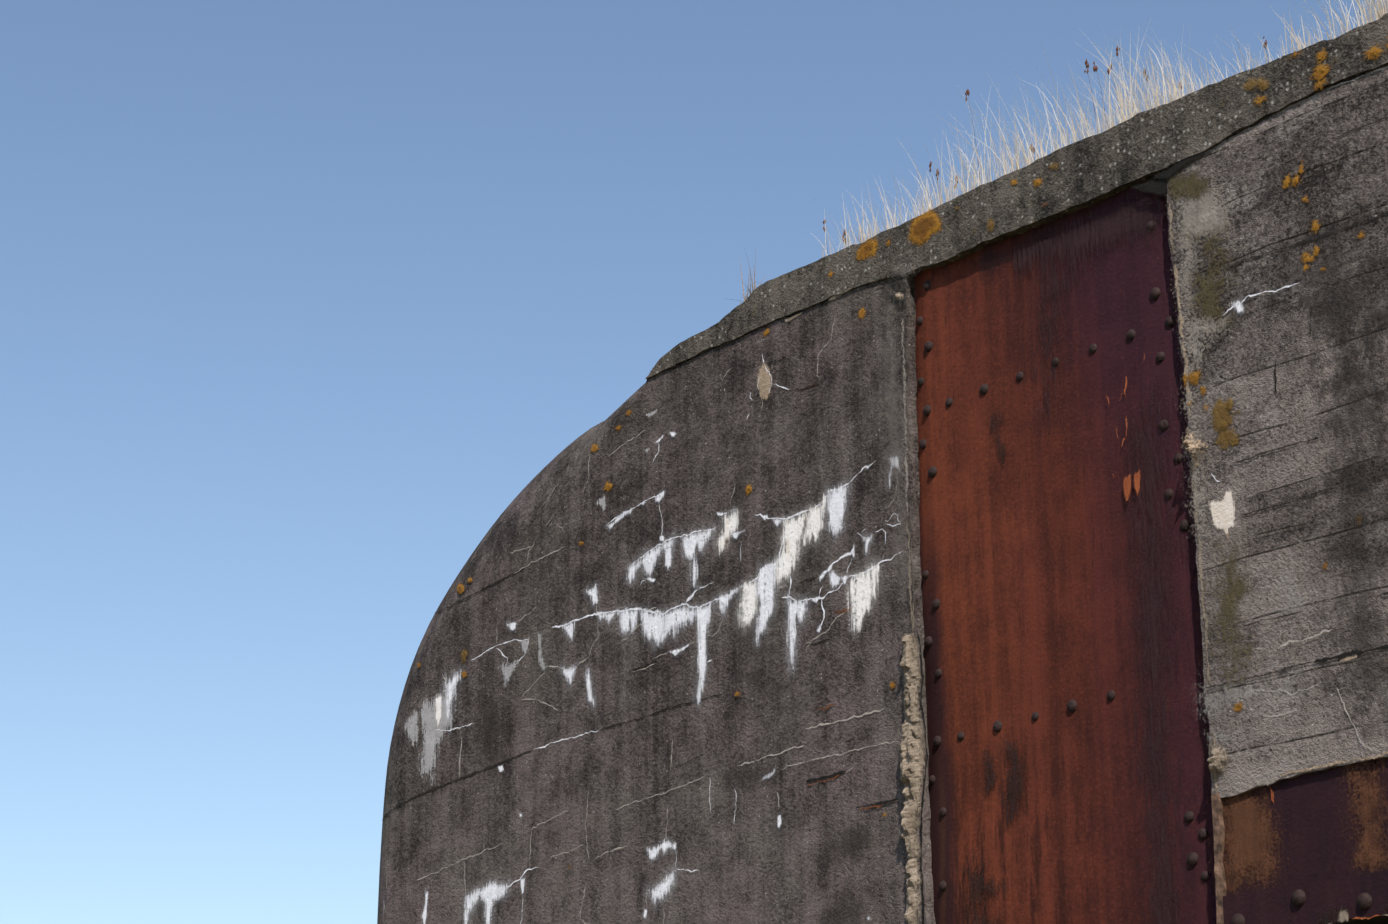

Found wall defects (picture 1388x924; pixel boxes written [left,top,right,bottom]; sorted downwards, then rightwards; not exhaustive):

corrosion [1123,470,1141,501]
water stain [472,456,901,705]
water stain [405,673,473,786]
corrosion [983,738,1027,826]
corrosion [1222,787,1279,893]
corrosion [1346,760,1388,873]
corrosion [1316,904,1388,924]